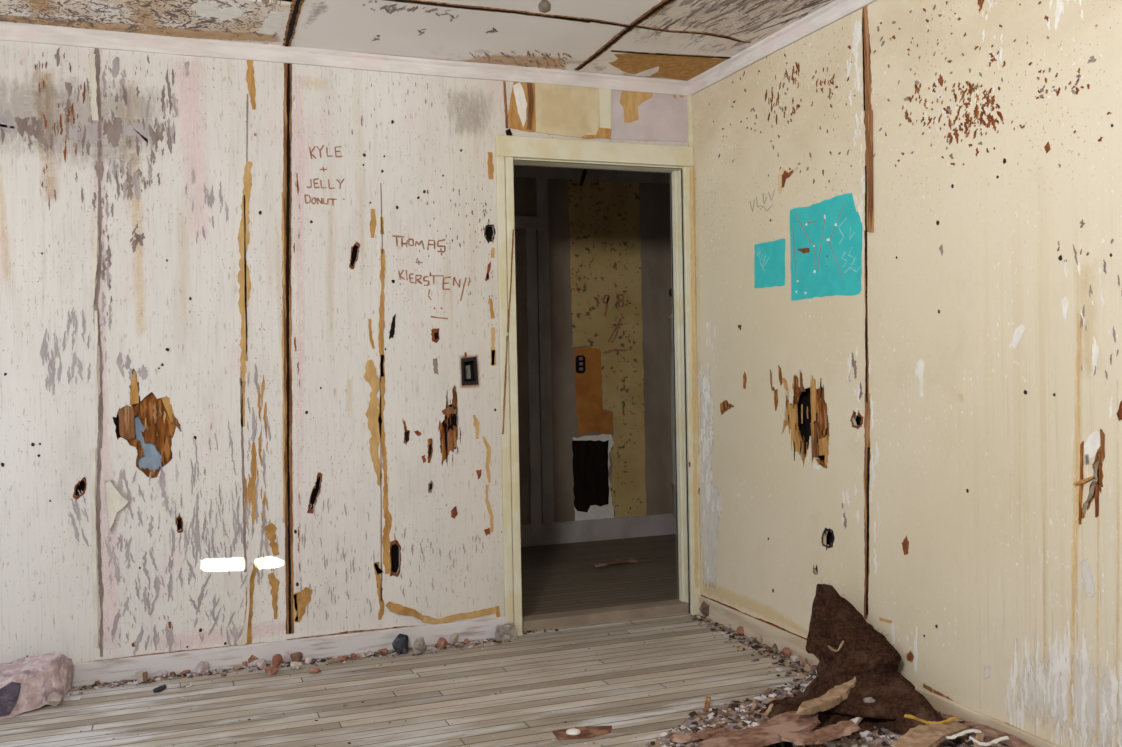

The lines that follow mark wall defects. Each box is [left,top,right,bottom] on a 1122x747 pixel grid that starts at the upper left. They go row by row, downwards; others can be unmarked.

peeling [0,0,284,38]
peeling [657,0,829,38]
peeling [887,0,1028,166]
peeling [1028,56,1097,99]
peeling [105,161,280,656]
peeling [293,209,497,623]
peeling [1084,430,1100,465]